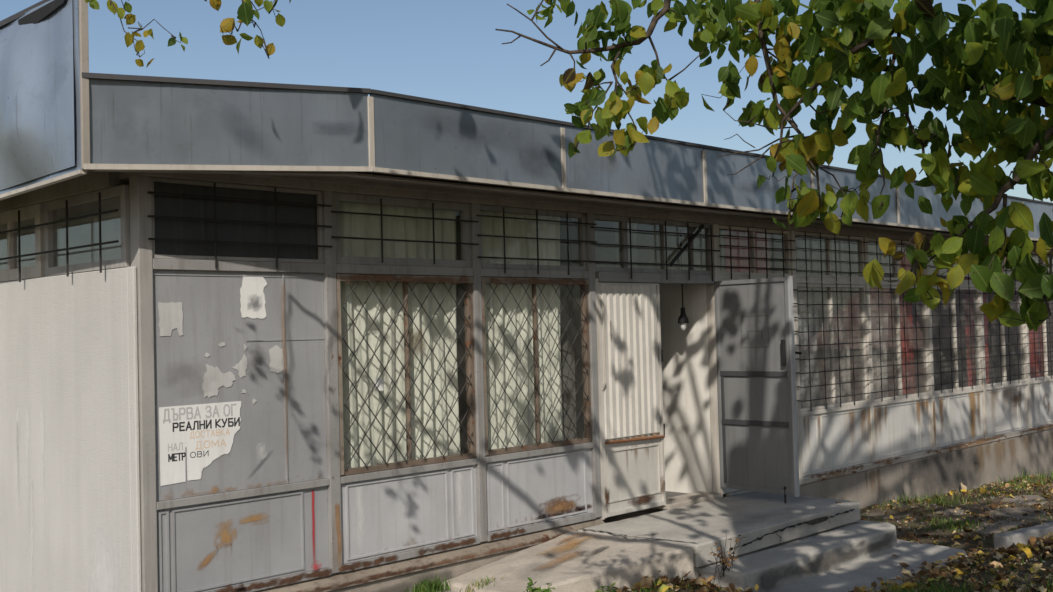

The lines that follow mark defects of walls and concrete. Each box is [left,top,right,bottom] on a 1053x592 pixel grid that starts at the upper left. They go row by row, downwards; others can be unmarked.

rust [917,398,943,438]
rust [969,386,1034,437]
rust [632,481,665,504]
rust [215,498,591,592]
crack [742,509,855,546]